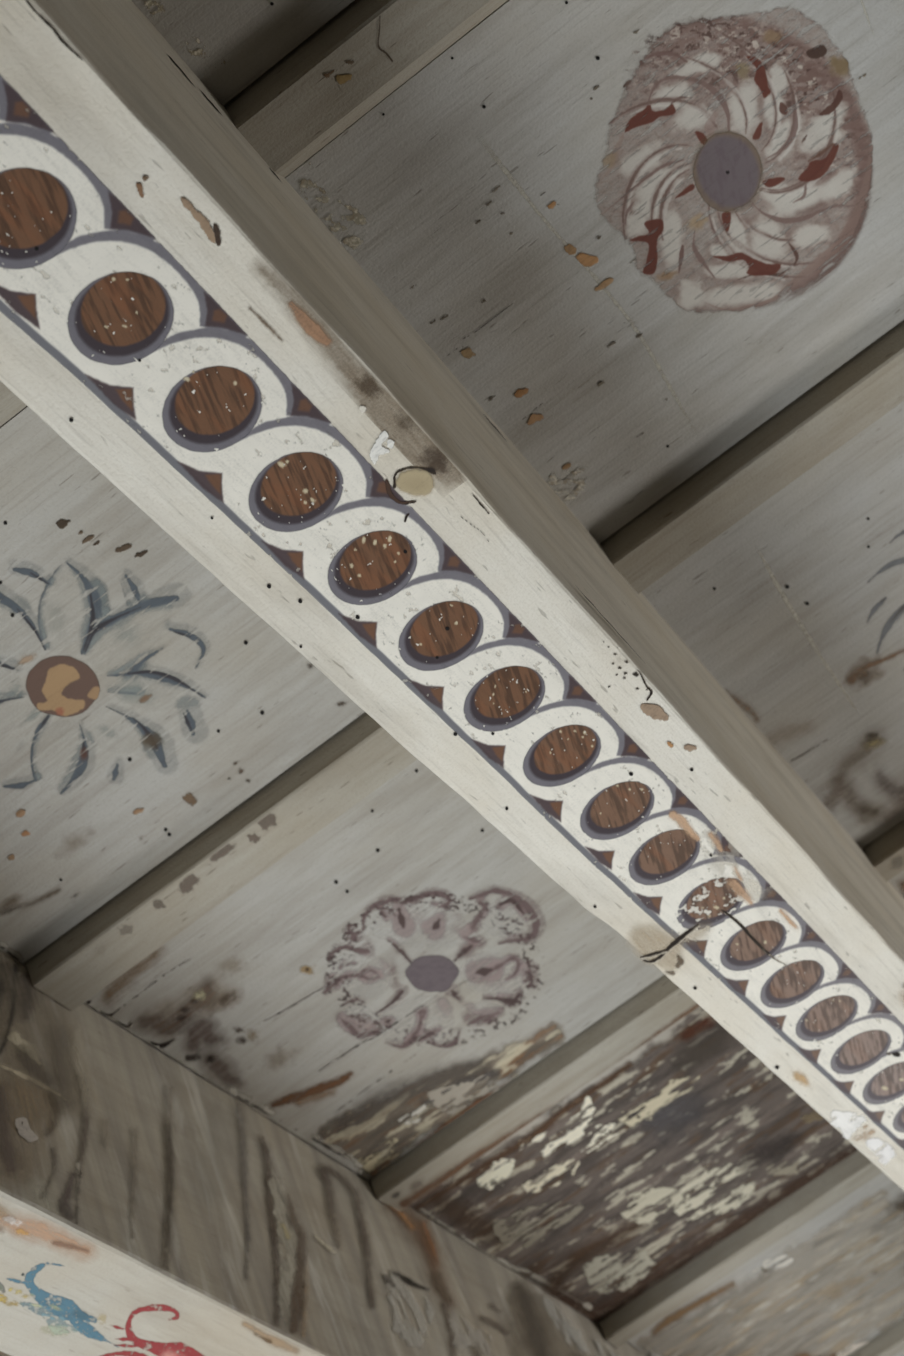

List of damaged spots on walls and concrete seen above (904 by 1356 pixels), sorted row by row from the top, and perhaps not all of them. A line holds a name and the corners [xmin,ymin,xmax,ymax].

crack [640,910,787,966]
peeling [318,1022,564,1176]
peeling [409,1008,895,1356]
peeling [387,1272,434,1347]